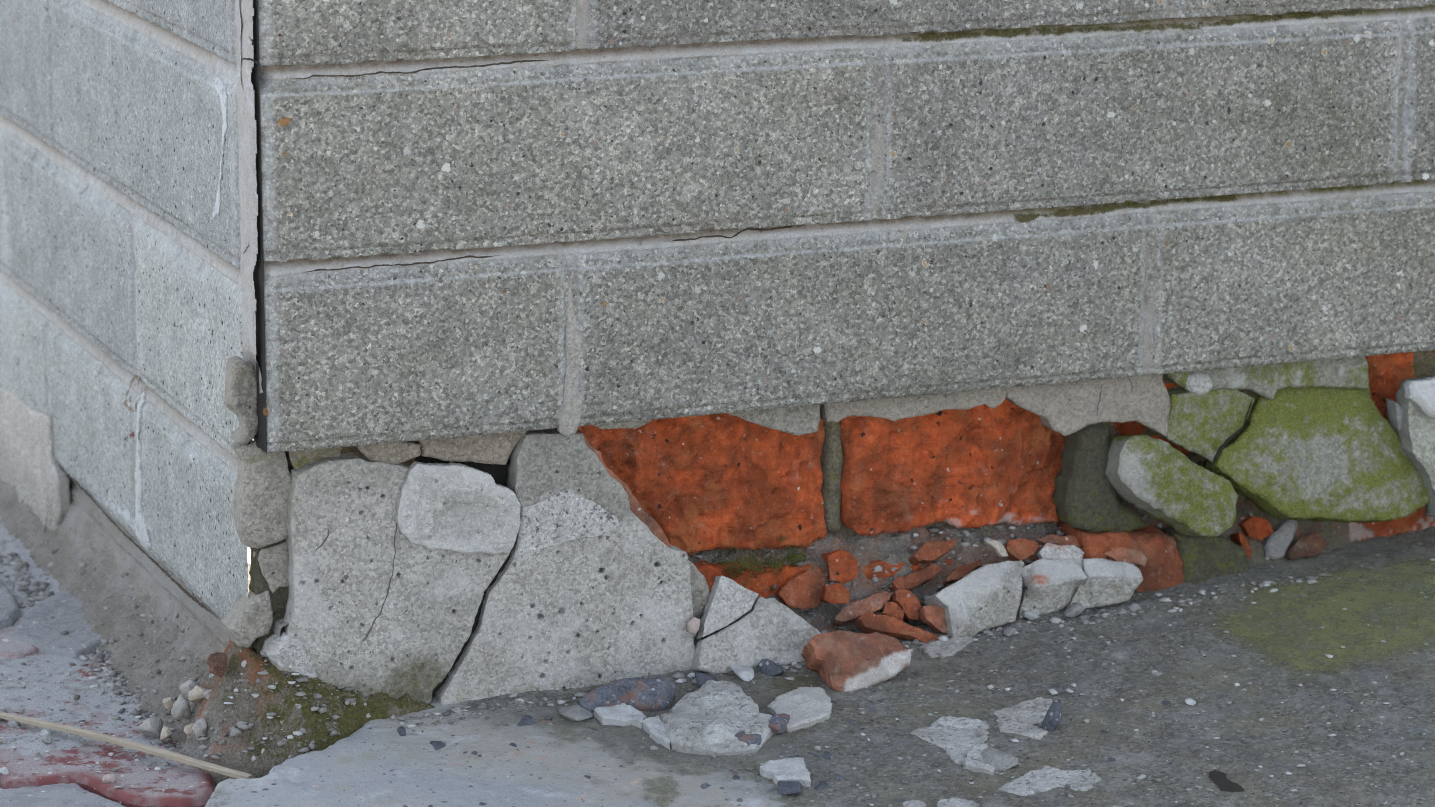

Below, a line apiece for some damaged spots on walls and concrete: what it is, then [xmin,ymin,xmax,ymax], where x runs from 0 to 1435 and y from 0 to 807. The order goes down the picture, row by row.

crack [239,0,555,472]
spalling [1386,375,1435,517]
crack [361,523,397,644]
crack [432,548,513,694]
spalling [261,428,1062,705]
spalling [1221,494,1351,565]
peeling [767,687,832,733]